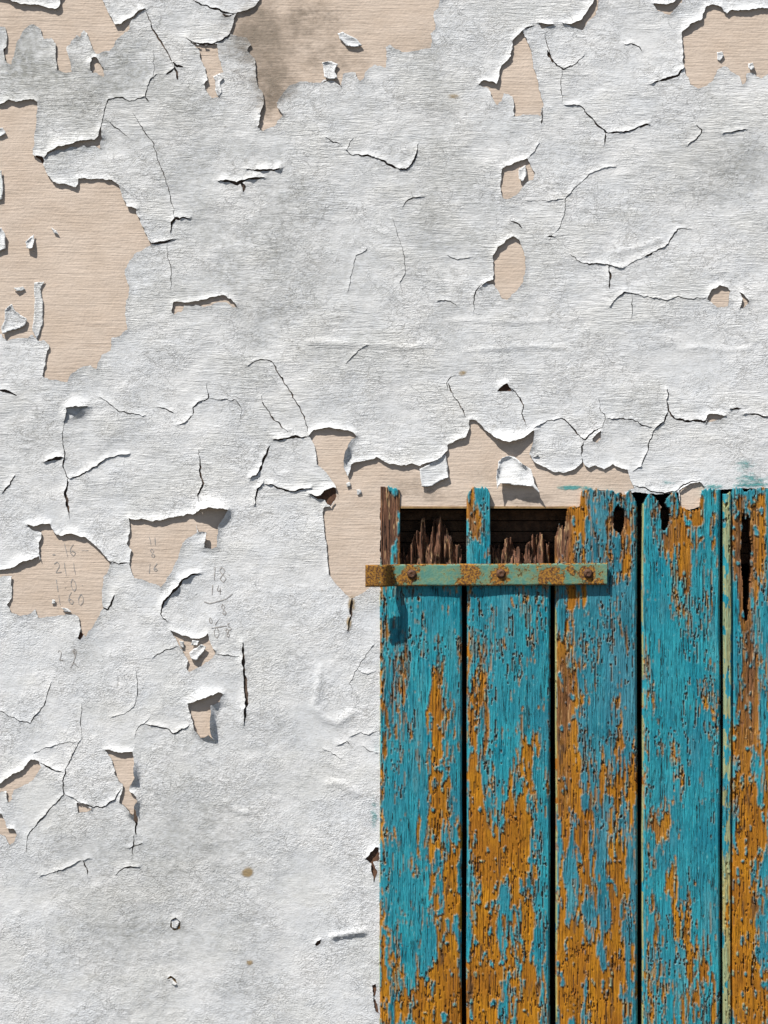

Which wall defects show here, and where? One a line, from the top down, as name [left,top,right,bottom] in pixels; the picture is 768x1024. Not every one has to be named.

peeling [229,0,440,132]
crack [522,26,651,239]
peeling [679,1,768,88]
peeling [0,95,152,382]
crack [329,139,419,290]
peeling [0,519,113,640]
crack [43,423,130,518]
peeling [125,495,235,589]
crack [101,359,314,506]
peeling [306,415,634,598]
crack [218,638,248,726]
crack [26,712,142,875]